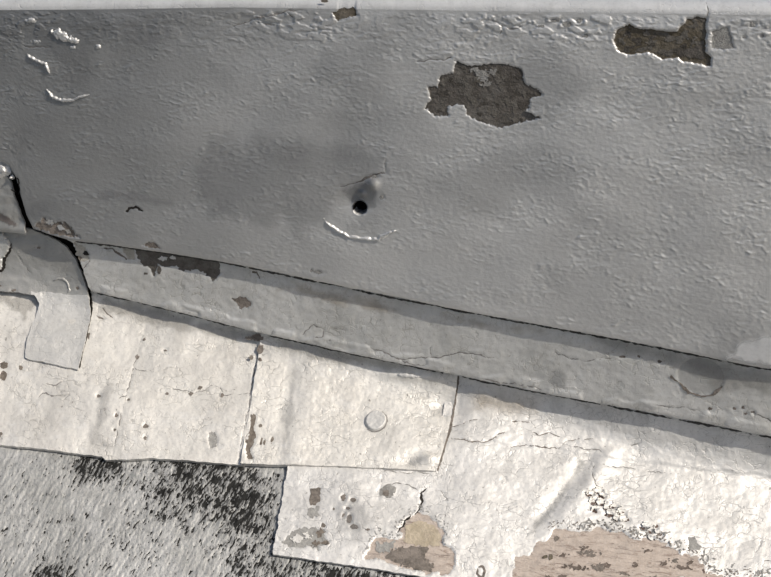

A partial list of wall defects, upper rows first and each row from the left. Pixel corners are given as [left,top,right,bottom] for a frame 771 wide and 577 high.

peeling [333,7,356,21]
peeling [614,16,734,66]
peeling [425,61,547,128]
crack [9,175,127,366]
peeling [122,242,220,281]
peeling [245,414,274,459]
peeling [281,487,330,551]
peeling [333,494,455,576]
crack [381,470,447,532]
peeling [512,486,771,577]